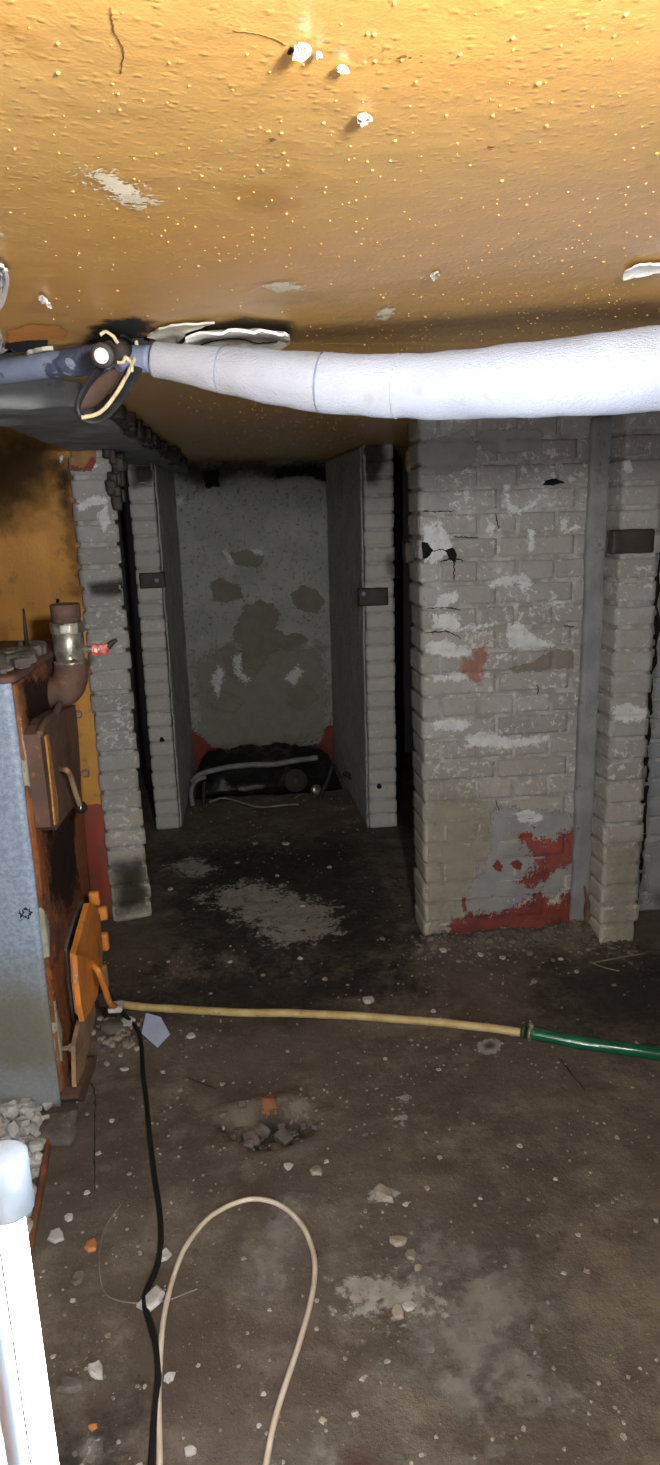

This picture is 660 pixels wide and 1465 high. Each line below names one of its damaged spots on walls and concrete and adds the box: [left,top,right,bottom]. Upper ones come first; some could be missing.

crack [110,8,125,75]
spalling [0,262,10,310]
peeling [623,262,660,281]
peeling [0,294,68,355]
spalling [229,550,264,567]
spalling [210,578,243,603]
spalling [290,585,325,614]
peeling [421,520,574,684]